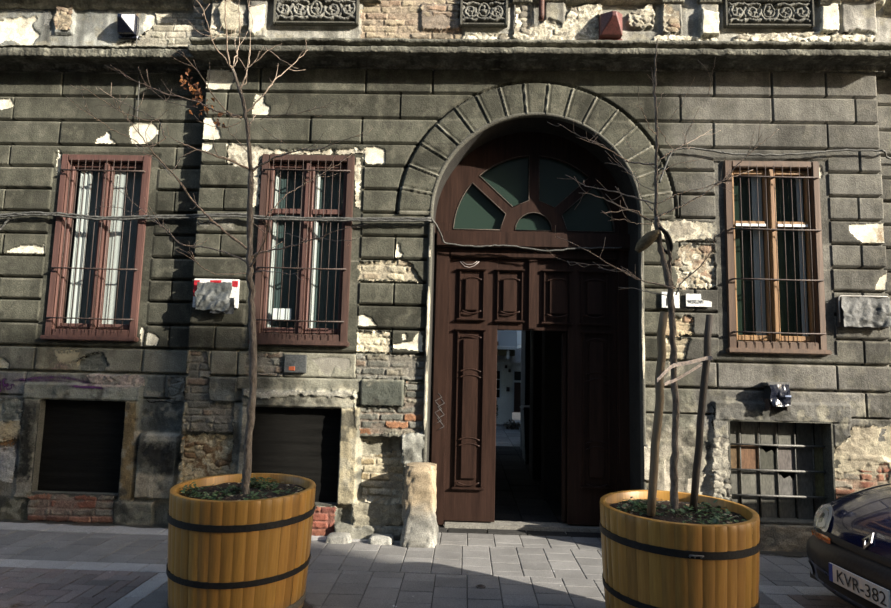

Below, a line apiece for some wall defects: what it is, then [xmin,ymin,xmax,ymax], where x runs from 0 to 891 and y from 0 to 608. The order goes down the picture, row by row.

peeling [0,15,40,45]
flaking render [359,0,602,40]
spalling [628,2,720,41]
peeling [96,132,116,144]
peeling [129,123,159,144]
spalling [202,118,385,209]
flaking render [651,219,717,290]
peeling [849,223,884,244]
flaking render [242,244,430,436]
flaking render [167,351,235,483]
spalling [687,437,732,501]
flaking render [834,425,891,499]